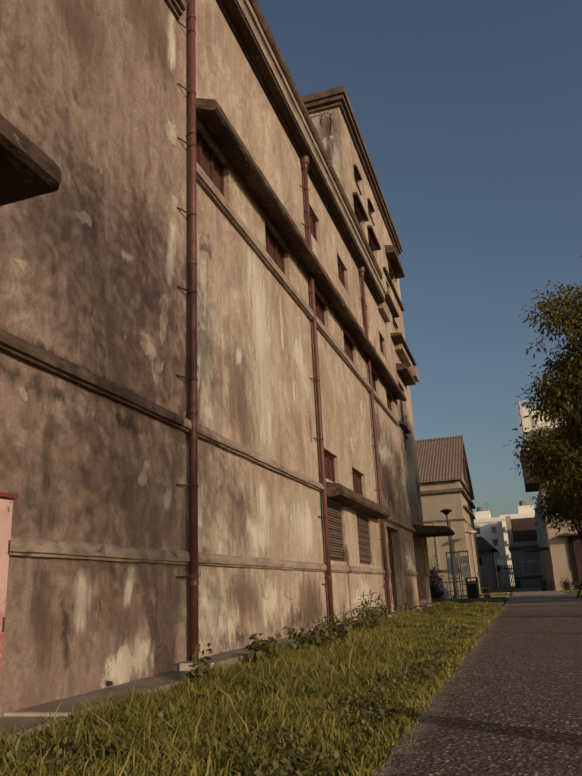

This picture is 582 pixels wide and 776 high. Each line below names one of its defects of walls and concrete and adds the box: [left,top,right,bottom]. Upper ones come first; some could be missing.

peeling [168,12,176,70]
crack [311,112,332,161]
peeling [75,210,92,227]
peeling [140,194,178,385]
water stain [197,234,225,432]
water stain [245,245,314,454]
water stain [124,567,134,607]
water stain [198,565,244,652]
water stain [255,578,320,633]